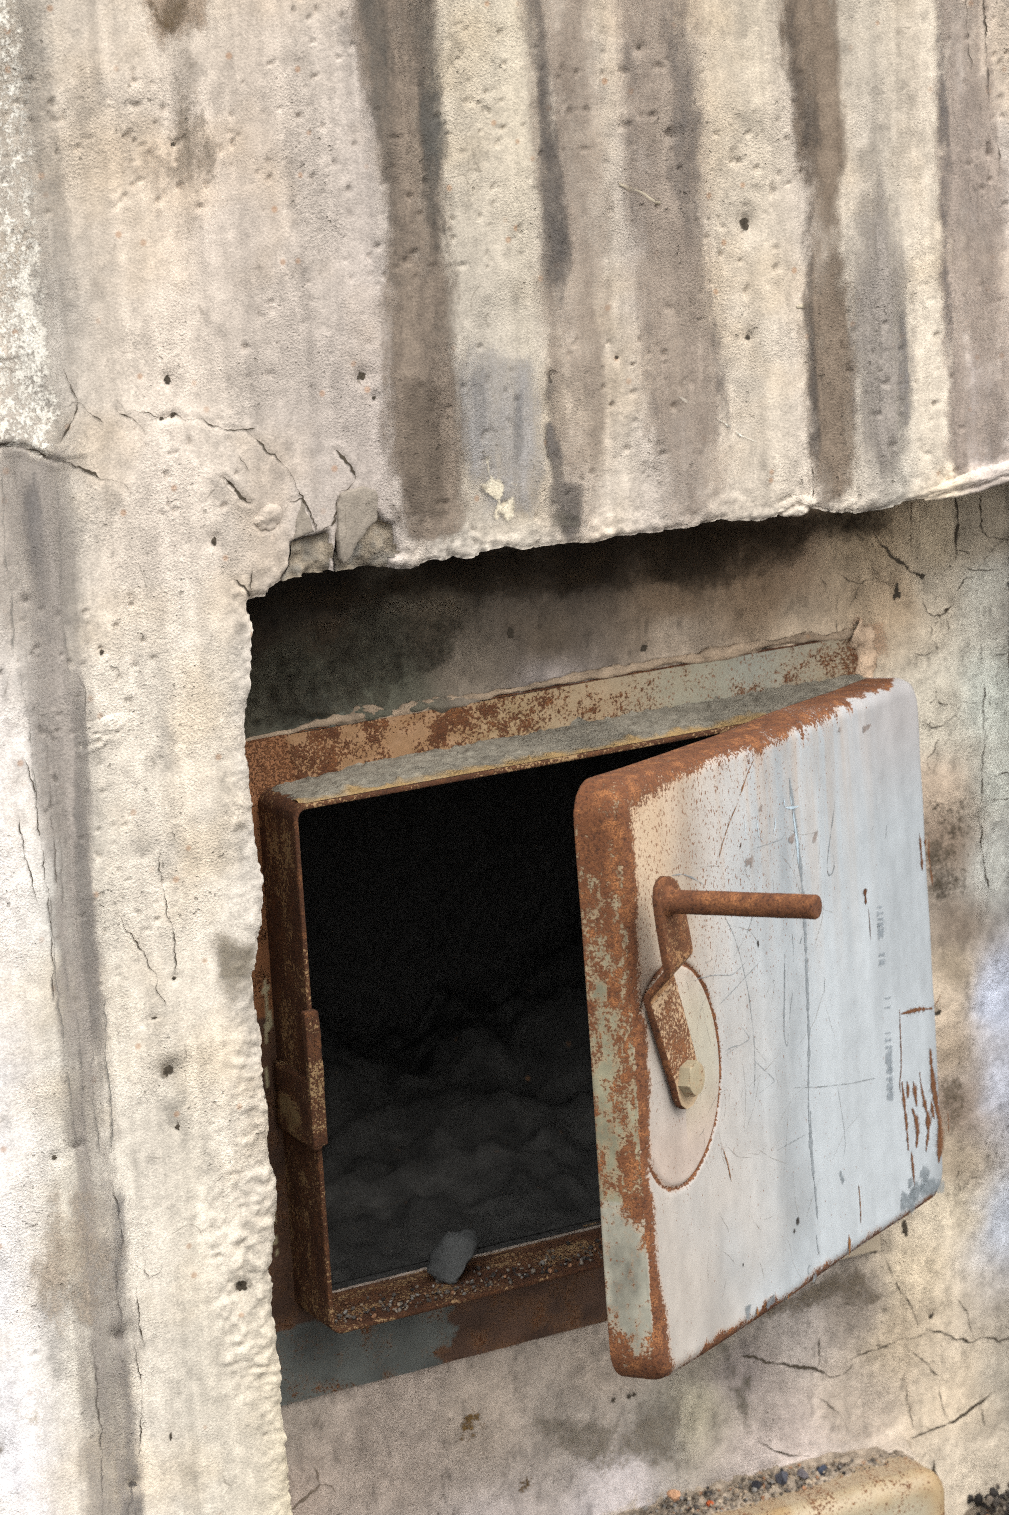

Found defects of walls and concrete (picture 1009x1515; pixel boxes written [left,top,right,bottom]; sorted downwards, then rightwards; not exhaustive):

water stain [353,0,603,542]
water stain [780,0,914,500]
water stain [936,0,1009,477]
crack [0,369,356,539]
peeling [282,486,400,581]
crack [821,497,1009,655]
water stain [0,0,141,1515]
corrosion [919,833,933,884]
crack [923,653,1009,892]
corrosion [900,995,949,1186]
crack [742,1261,1009,1476]